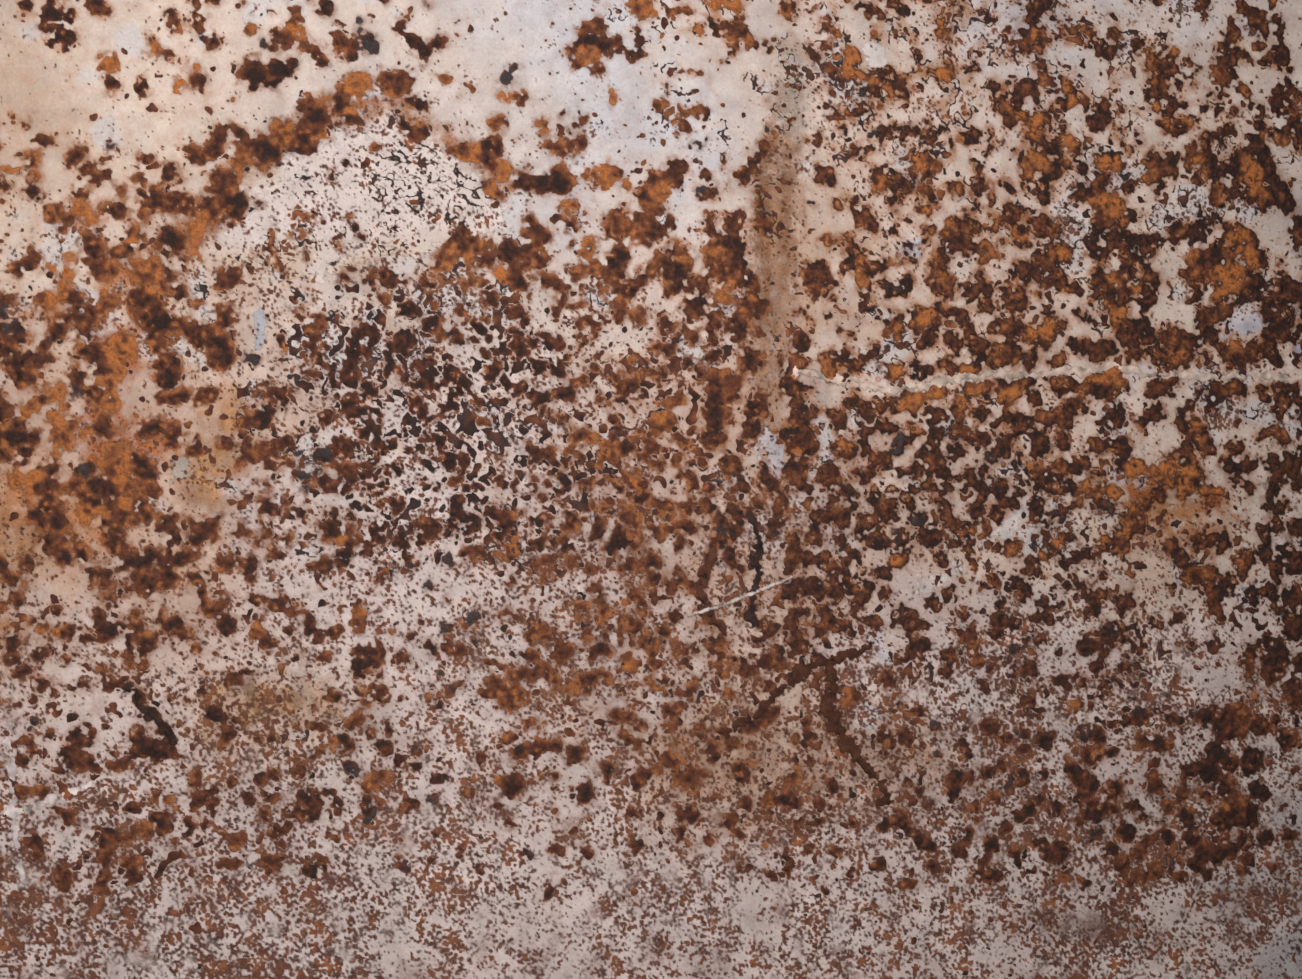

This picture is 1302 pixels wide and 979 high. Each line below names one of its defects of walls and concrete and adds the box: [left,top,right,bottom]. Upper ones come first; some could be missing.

corrosion [0,0,112,66]
corrosion [96,0,224,125]
corrosion [234,0,379,92]
corrosion [392,10,453,86]
corrosion [609,84,621,105]
corrosion [541,0,694,78]
corrosion [651,83,727,170]
corrosion [376,301,451,361]
corrosion [358,330,460,437]
corrosion [453,324,589,482]
corrosion [372,428,444,509]